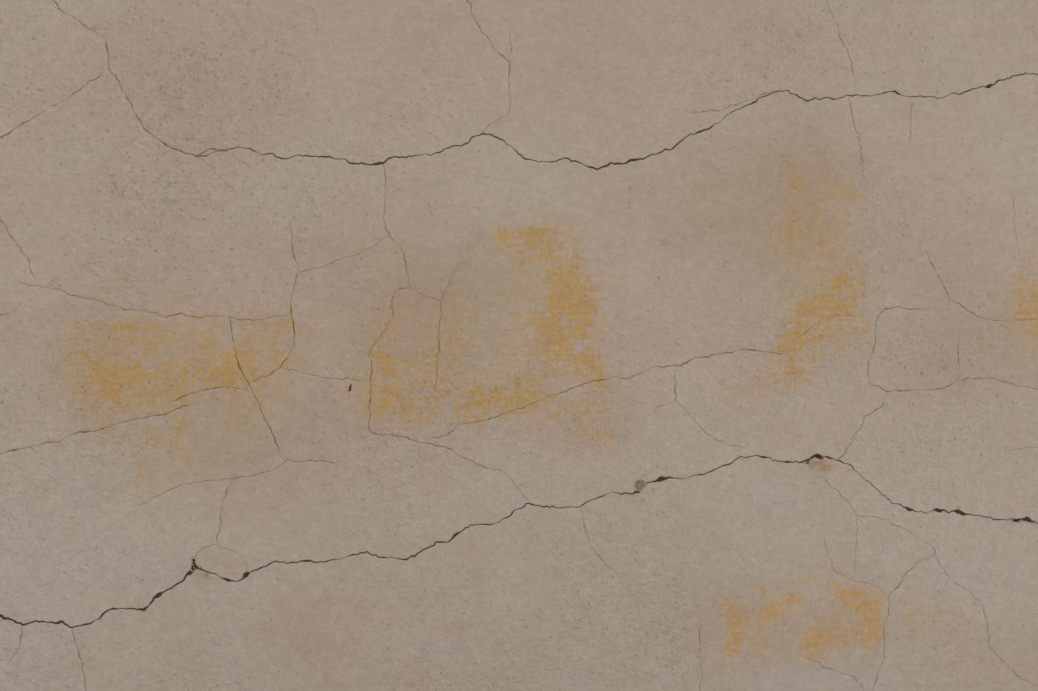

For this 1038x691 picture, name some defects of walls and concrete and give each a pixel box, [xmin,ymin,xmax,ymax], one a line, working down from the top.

crack [0,0,1038,187]
crack [0,200,1038,691]